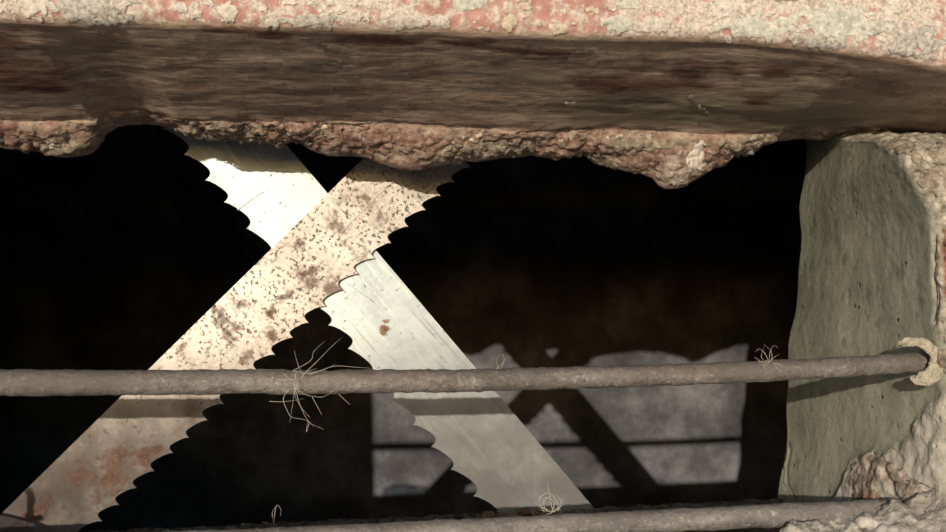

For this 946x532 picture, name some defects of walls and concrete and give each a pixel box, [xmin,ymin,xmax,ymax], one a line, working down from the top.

leakage [0,28,73,93]
peeling [0,0,141,31]
peeling [173,0,239,23]
leakage [262,31,293,40]
peeling [257,0,388,31]
leakage [333,33,415,45]
peeling [389,0,489,31]
leakage [443,40,577,61]
peeling [694,0,946,61]
leakage [568,62,741,101]
spalling [4,131,92,158]
spalling [174,118,778,188]